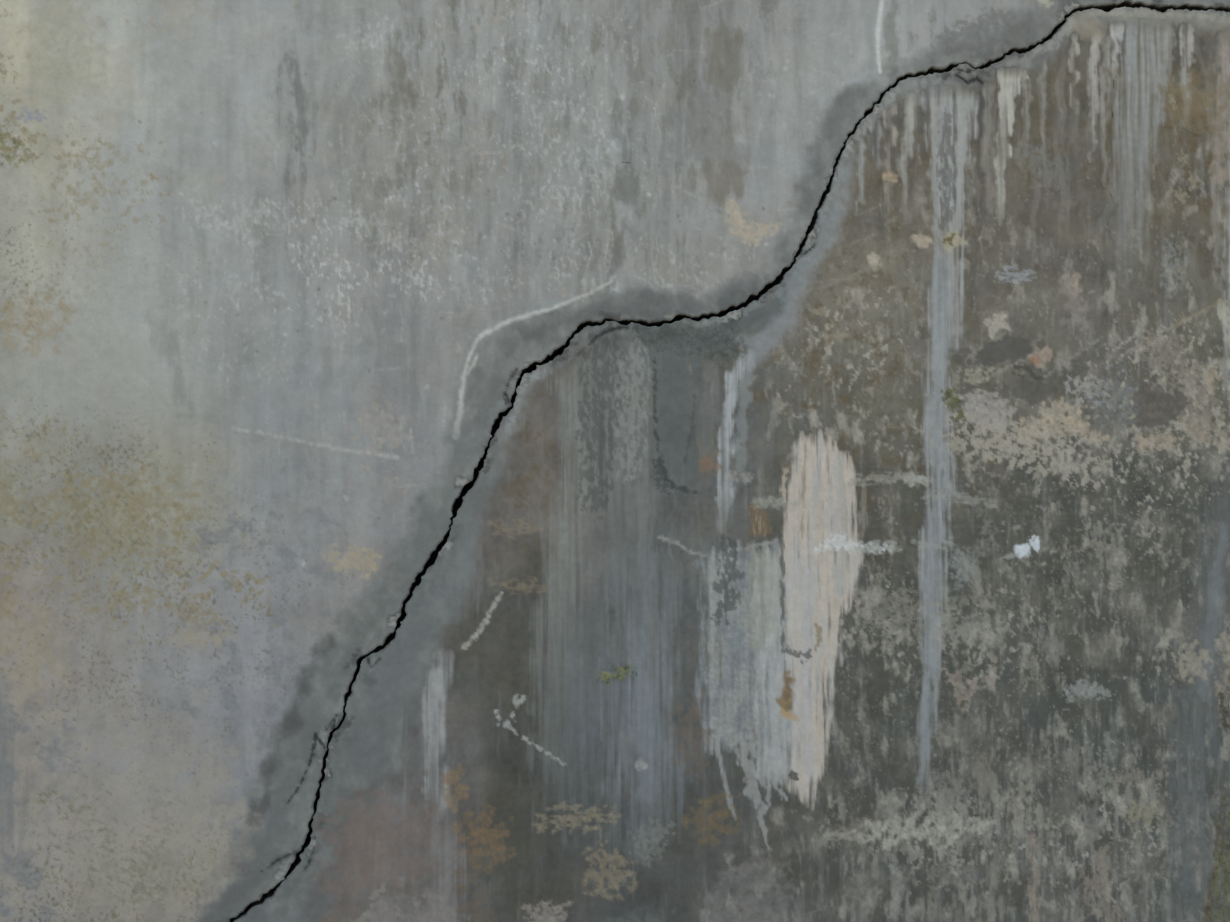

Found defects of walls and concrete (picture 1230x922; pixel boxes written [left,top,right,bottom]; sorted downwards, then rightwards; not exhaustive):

crack [953,73,986,88]
leakage [1065,17,1230,291]
crack [502,366,520,406]
crack [721,309,743,325]
leakage [852,0,1051,794]
crack [259,848,299,874]
crack [284,730,325,806]
leakage [398,515,482,918]
peeling [520,798,678,922]
leakage [523,331,764,865]
peeling [691,427,1009,922]
leakage [1159,448,1230,922]